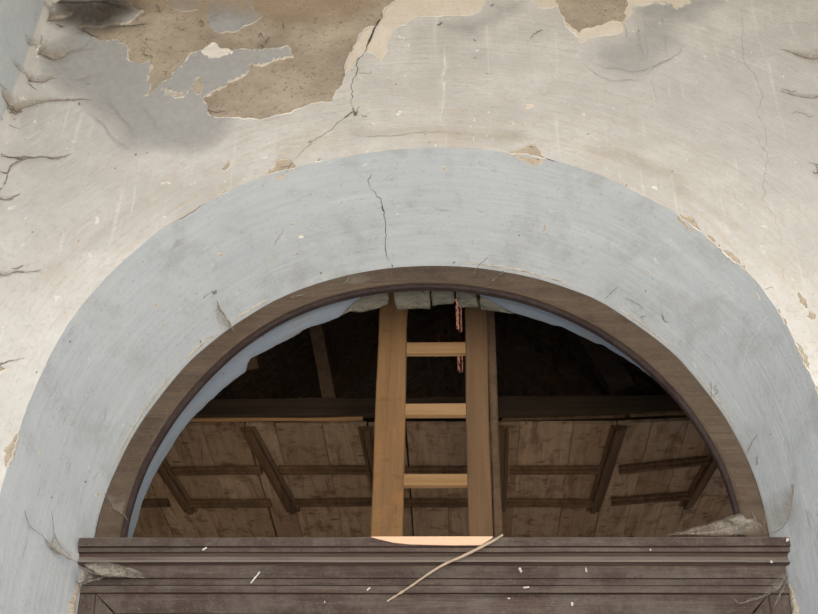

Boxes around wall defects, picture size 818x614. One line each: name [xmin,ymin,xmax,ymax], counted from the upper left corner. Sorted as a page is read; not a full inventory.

flaking render [77,0,486,120]
crack [298,14,382,156]
flaking render [533,0,692,43]
flaking render [507,144,546,166]
crack [368,174,393,267]